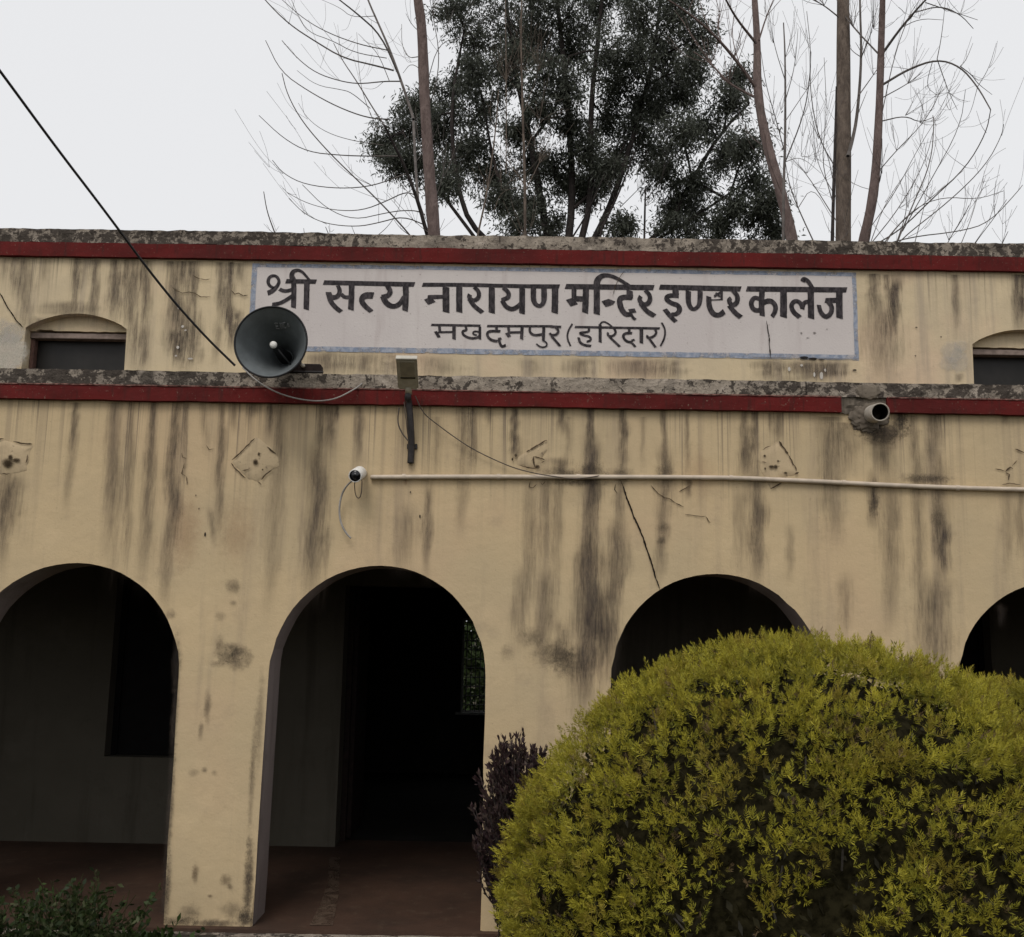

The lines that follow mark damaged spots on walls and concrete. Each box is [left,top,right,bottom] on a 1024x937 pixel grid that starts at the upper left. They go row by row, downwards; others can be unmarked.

damp [218,262,238,339]
damp [890,283,899,321]
spalling [0,438,33,475]
spalling [231,438,280,484]
damp [576,409,608,680]
crack [614,482,660,590]
damp [938,529,947,564]
damp [239,864,253,923]